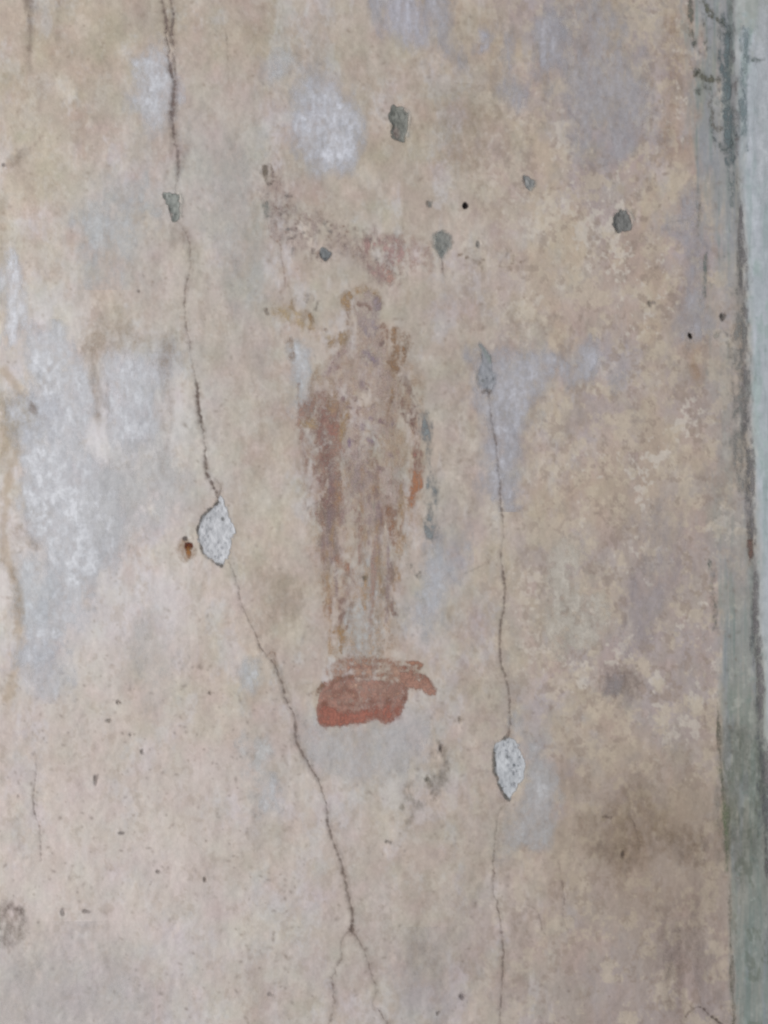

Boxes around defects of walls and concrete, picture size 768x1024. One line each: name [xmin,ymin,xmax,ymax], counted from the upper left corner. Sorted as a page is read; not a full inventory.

crack [168,64,176,135]
spalling [388,105,408,142]
spalling [612,210,632,233]
crack [195,383,203,423]
crack [327,819,354,932]